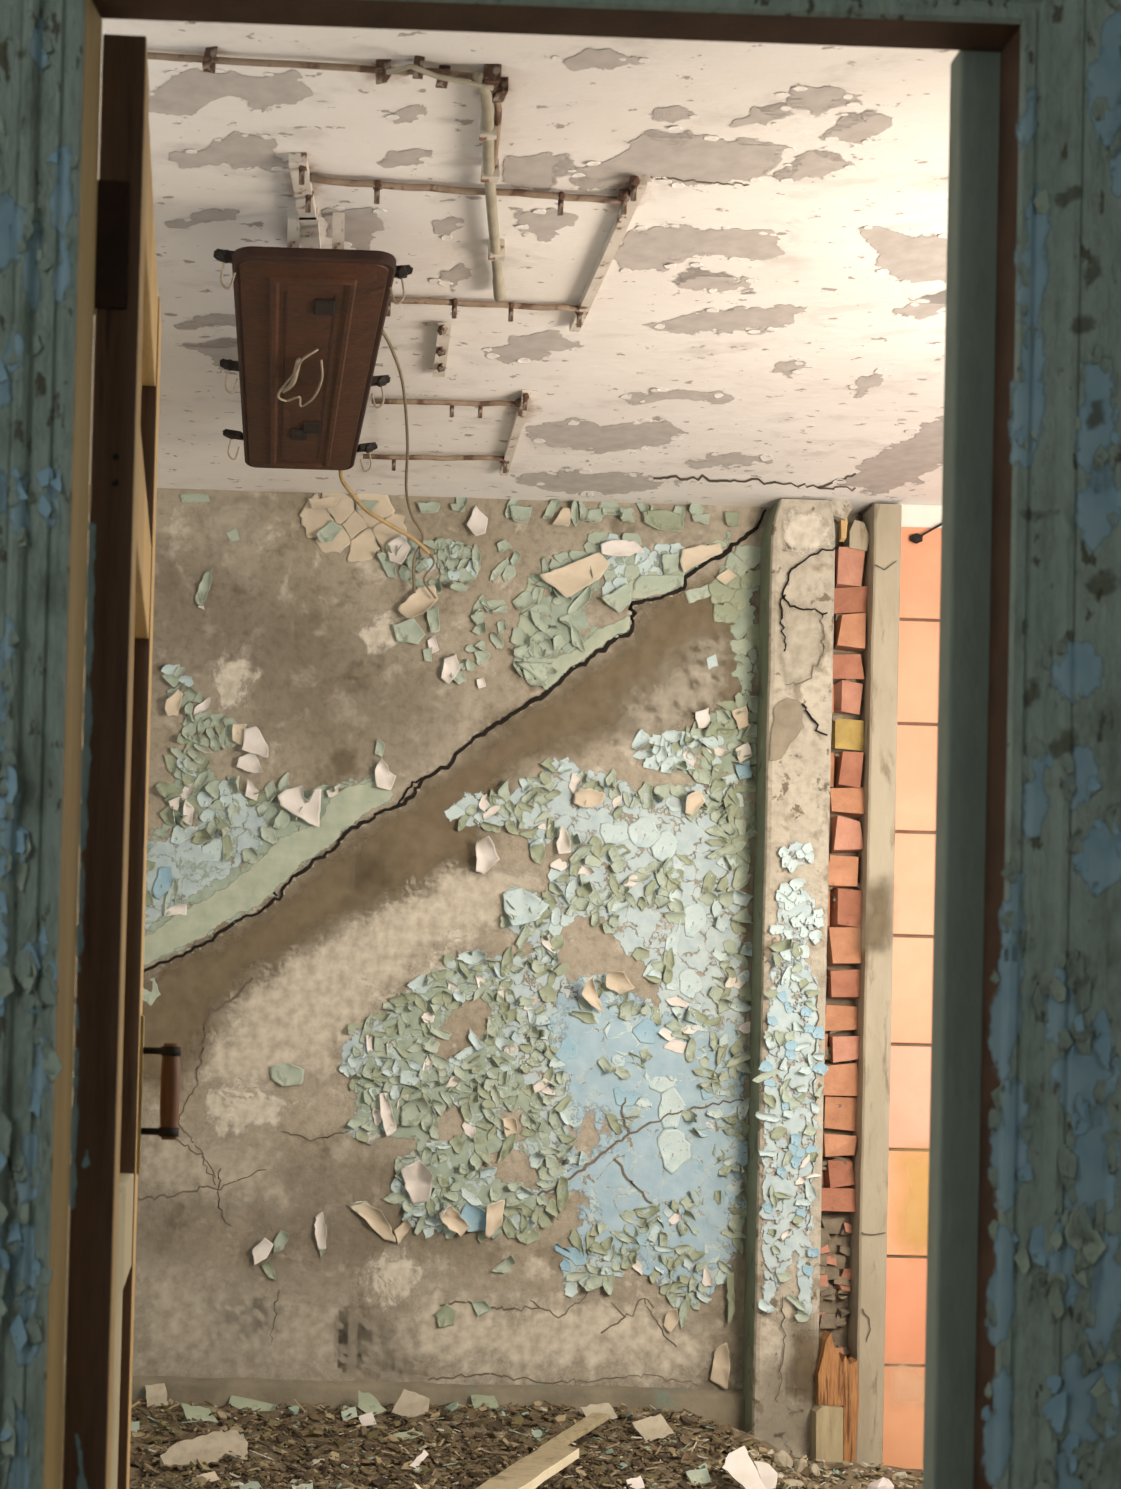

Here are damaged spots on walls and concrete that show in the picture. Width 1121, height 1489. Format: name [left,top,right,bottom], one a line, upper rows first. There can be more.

peeling [149,69,313,116]
peeling [502,83,893,242]
peeling [482,330,584,364]
peeling [613,221,806,336]
peeling [860,225,947,320]
peeling [832,416,944,496]
crack [143,473,856,973]
peeling [143,664,396,1006]
peeling [299,387,831,1333]
peeling [0,616,63,1366]
peeling [986,855,1121,1489]
peeling [710,1343,730,1389]